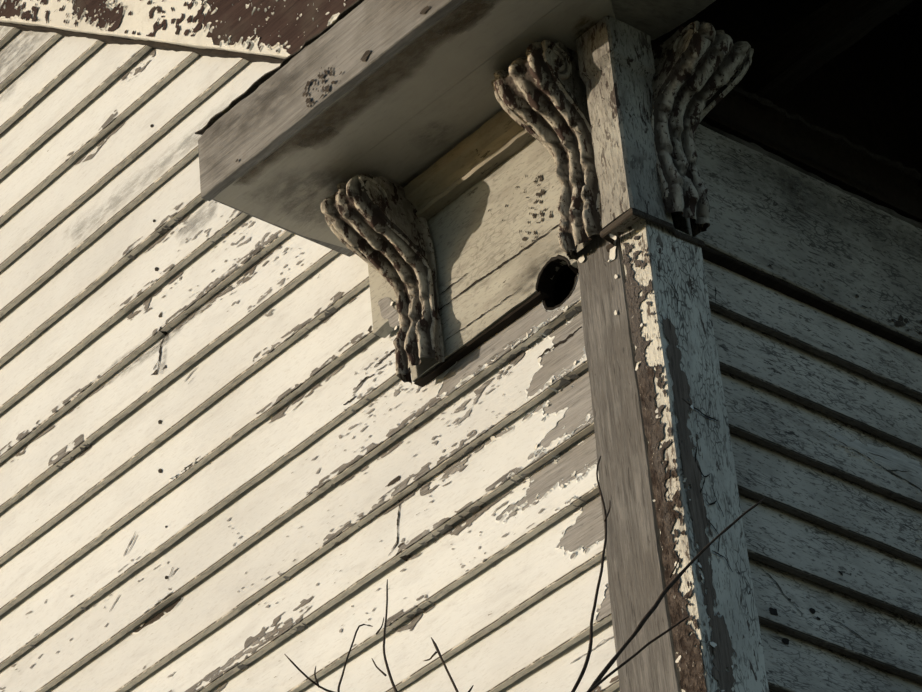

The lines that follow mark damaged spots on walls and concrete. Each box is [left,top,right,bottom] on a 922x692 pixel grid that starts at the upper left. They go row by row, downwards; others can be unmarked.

peeling [0,0,357,55]
spalling [116,49,155,80]
crack [153,327,168,375]
peeling [253,274,605,572]
peeling [608,234,737,692]
crack [390,494,400,553]
peeling [129,576,183,636]
spalling [386,594,435,632]
spalling [185,594,313,692]